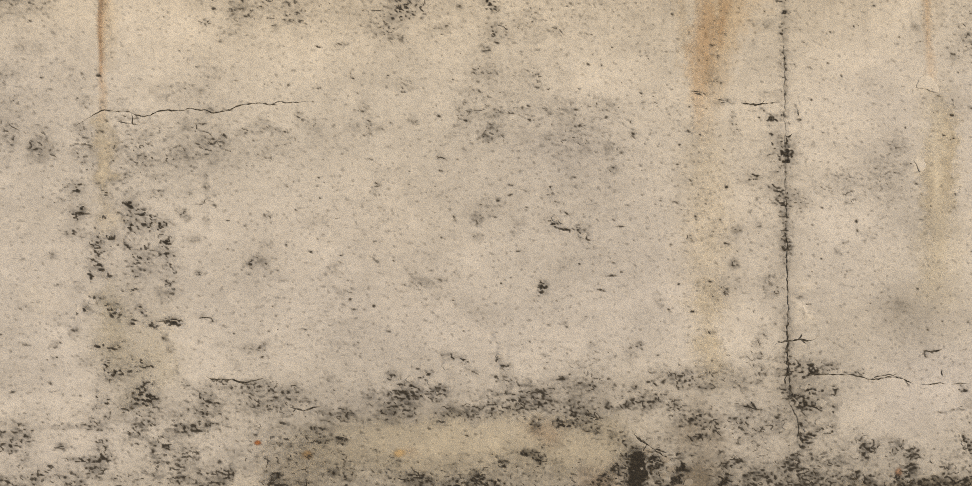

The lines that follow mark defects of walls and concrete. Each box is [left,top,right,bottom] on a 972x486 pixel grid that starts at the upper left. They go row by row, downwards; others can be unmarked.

crack [76,101,305,126]
crack [694,51,966,439]
water stain [311,417,651,486]